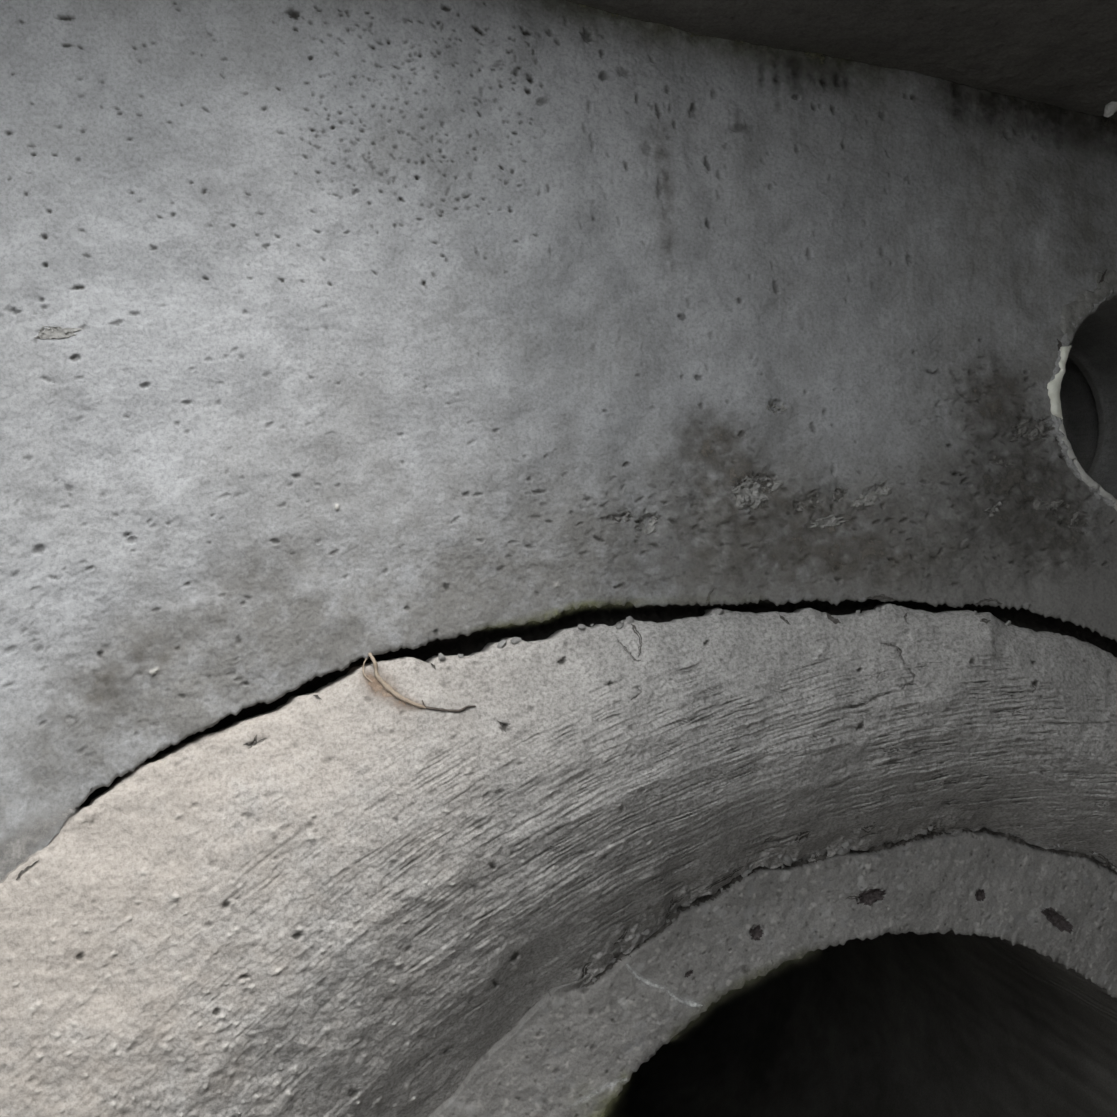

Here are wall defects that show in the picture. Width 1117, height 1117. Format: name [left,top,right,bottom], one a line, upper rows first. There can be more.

leakage [694,426,912,583]
leakage [966,450,1087,565]
crack [74,588,1117,810]
crack [581,824,1117,987]